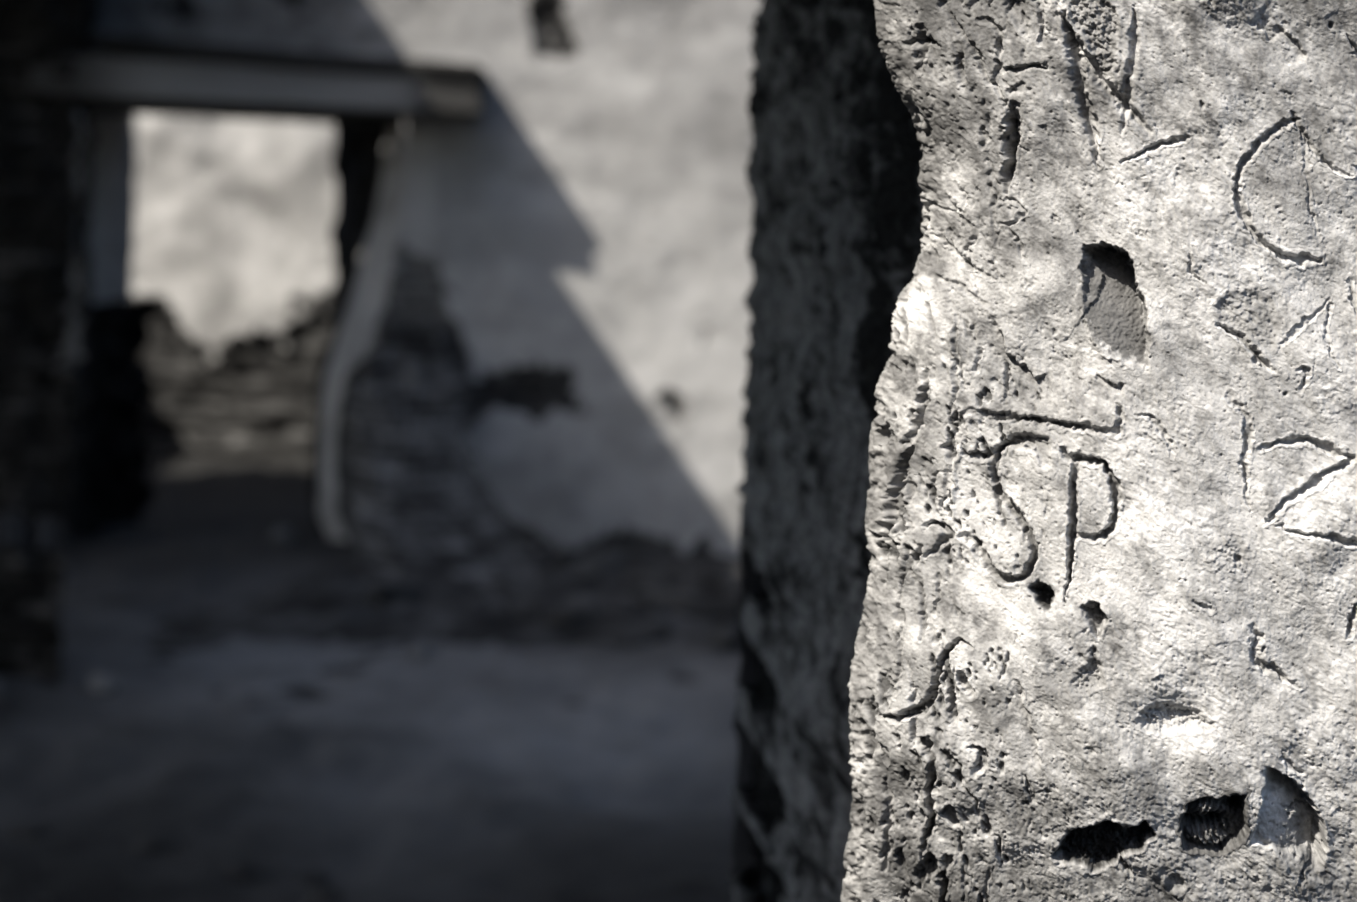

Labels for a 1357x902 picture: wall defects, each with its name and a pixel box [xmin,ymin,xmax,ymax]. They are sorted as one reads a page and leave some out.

flaking render [122,290,353,465]
flaking render [334,238,588,541]
flaking render [509,518,713,556]